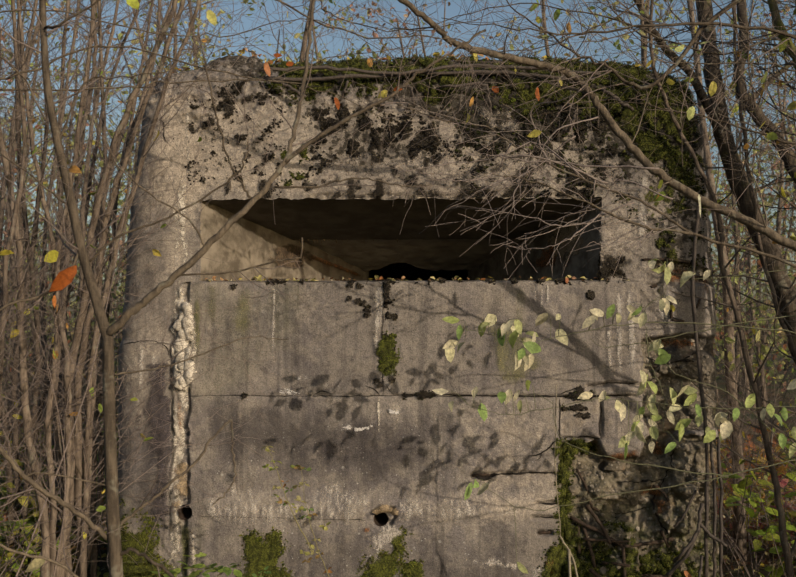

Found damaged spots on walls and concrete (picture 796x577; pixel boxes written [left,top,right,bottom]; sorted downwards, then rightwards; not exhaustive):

water stain [169,381,197,572]
water stain [173,288,196,348]
crack [195,361,416,397]
crack [435,350,701,518]
spalling [558,335,720,577]